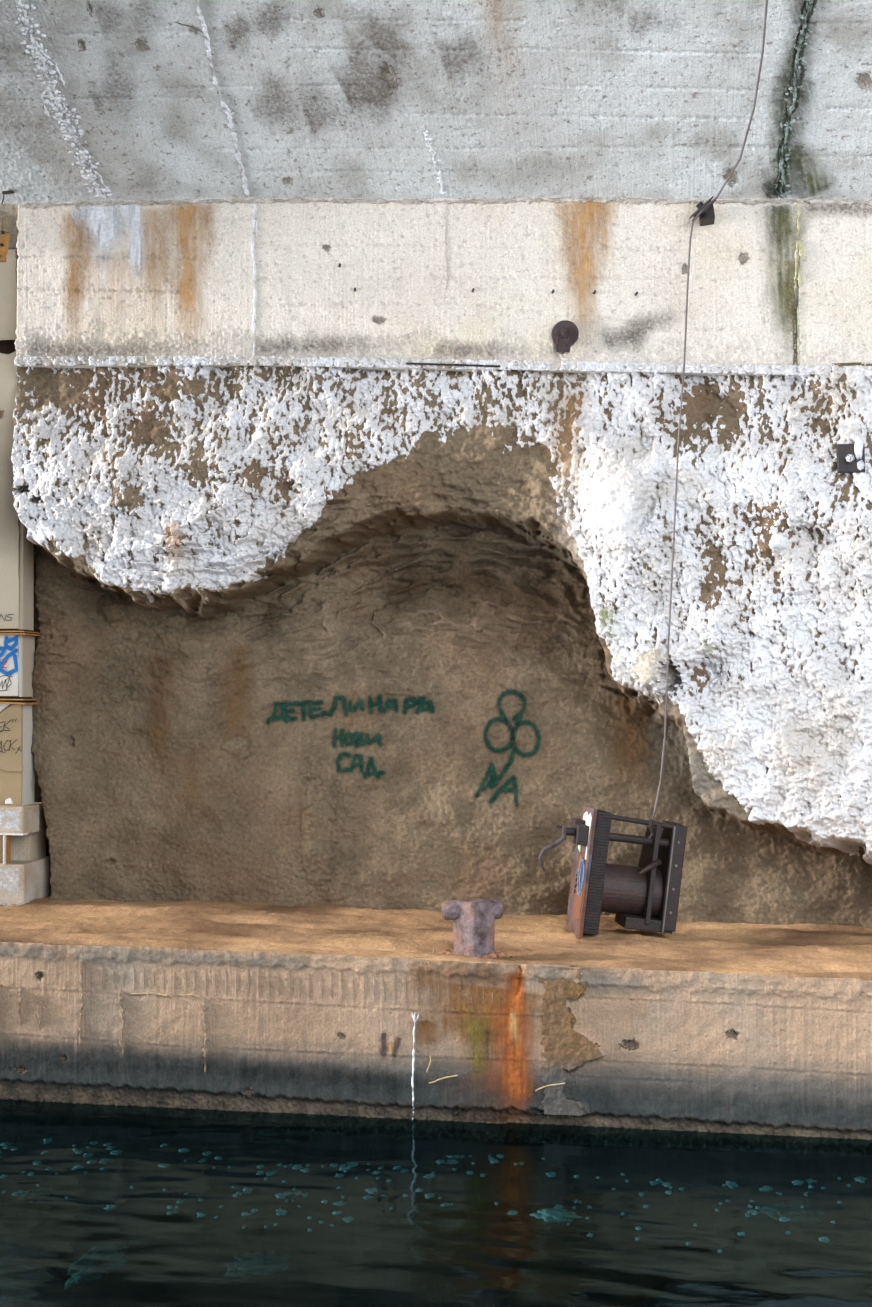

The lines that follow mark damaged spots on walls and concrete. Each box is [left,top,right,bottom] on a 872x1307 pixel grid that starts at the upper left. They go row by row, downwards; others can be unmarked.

water stain [765,0,869,230]
rust [67,213,95,308]
rust [176,204,199,311]
rust [573,198,606,307]
water stain [11,319,872,864]
spalling [0,965,872,1140]
rust [503,967,526,1102]